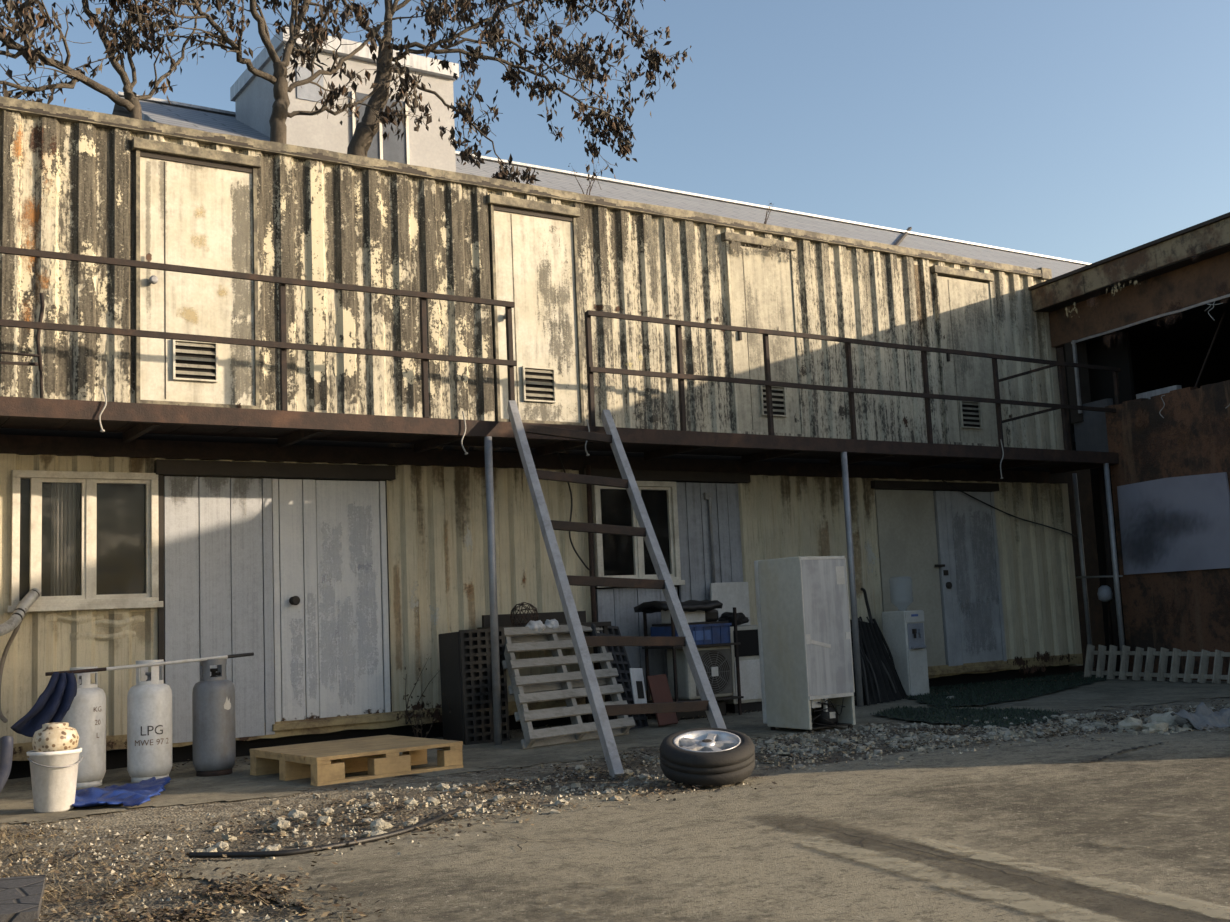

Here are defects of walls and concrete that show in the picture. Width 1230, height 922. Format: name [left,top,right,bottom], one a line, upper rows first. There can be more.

rust [14,126,57,183]
peeling [10,117,96,210]
rust [20,198,49,321]
peeling [14,218,112,384]
peeling [261,335,272,383]
peeling [263,183,287,294]
peeling [288,167,357,382]
peeling [354,182,419,350]
peeling [398,212,490,399]
leakage [523,398,562,421]
leakage [535,202,795,413]
leakage [914,265,932,344]